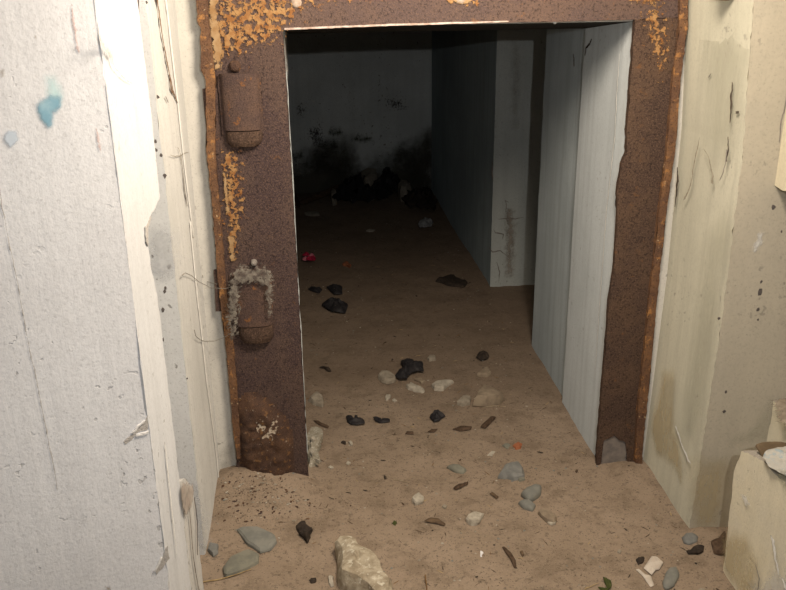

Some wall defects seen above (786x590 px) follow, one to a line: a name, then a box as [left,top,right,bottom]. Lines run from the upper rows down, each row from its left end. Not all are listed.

rust [209,0,335,70]
rust [629,0,670,83]
water stain [292,124,361,194]
rust [220,149,245,261]
rust [256,419,278,443]
rust [601,436,627,464]